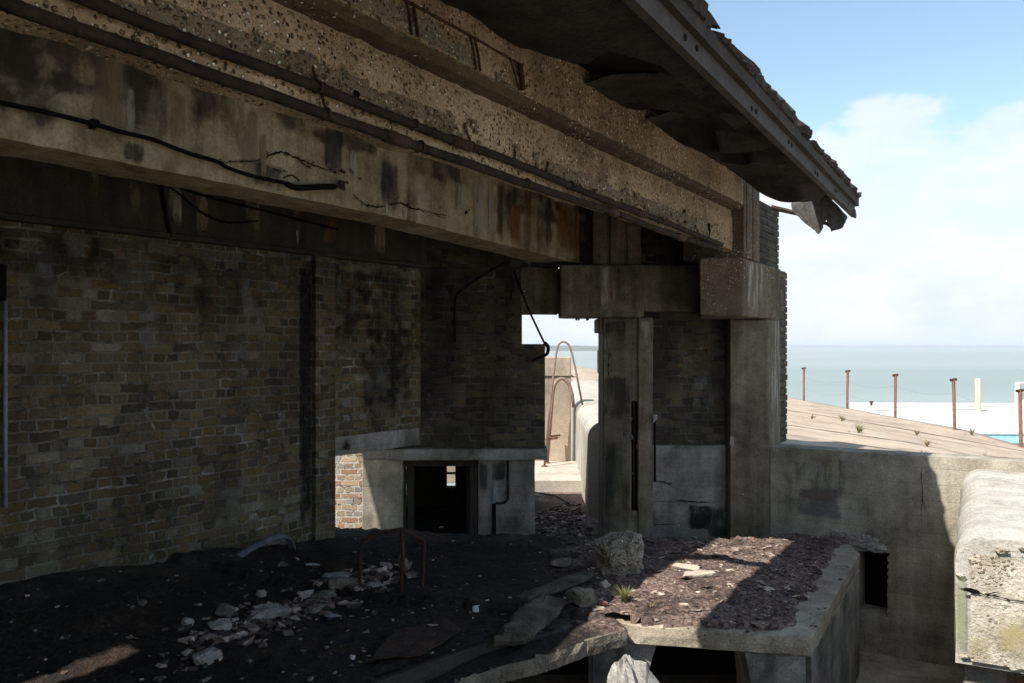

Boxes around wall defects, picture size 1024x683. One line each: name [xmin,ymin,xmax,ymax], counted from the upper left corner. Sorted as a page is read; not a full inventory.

damp [0,29,162,161]
crack [218,151,448,220]
damp [314,129,376,176]
damp [382,162,407,218]
damp [300,269,311,520]
crack [959,588,1024,602]